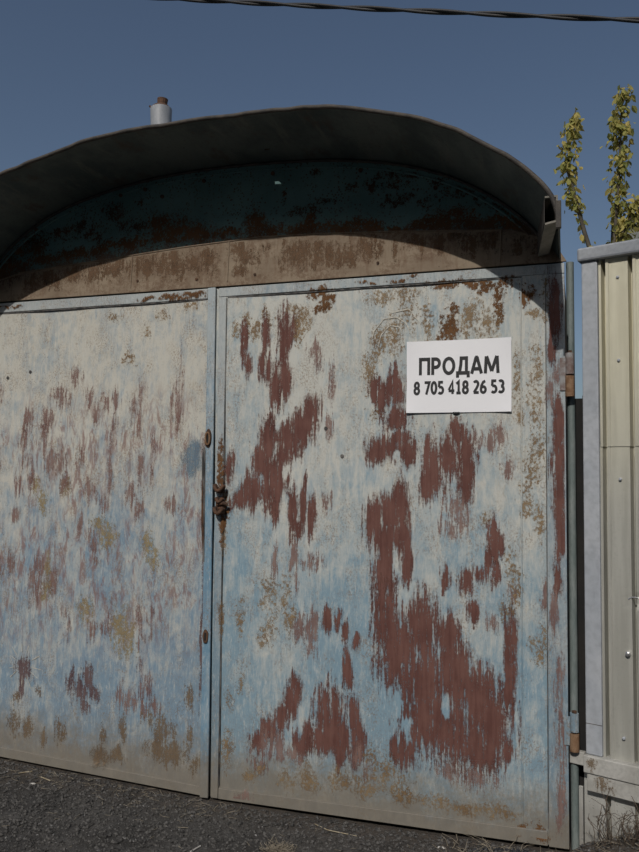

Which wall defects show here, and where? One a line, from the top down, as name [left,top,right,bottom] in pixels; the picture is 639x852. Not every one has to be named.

corrosion [0,204,499,293]
corrosion [232,304,276,342]
corrosion [286,283,336,349]
corrosion [498,545,524,623]
corrosion [6,692,67,748]
corrosion [91,713,128,769]
corrosion [140,709,200,778]
corrosion [184,683,194,713]